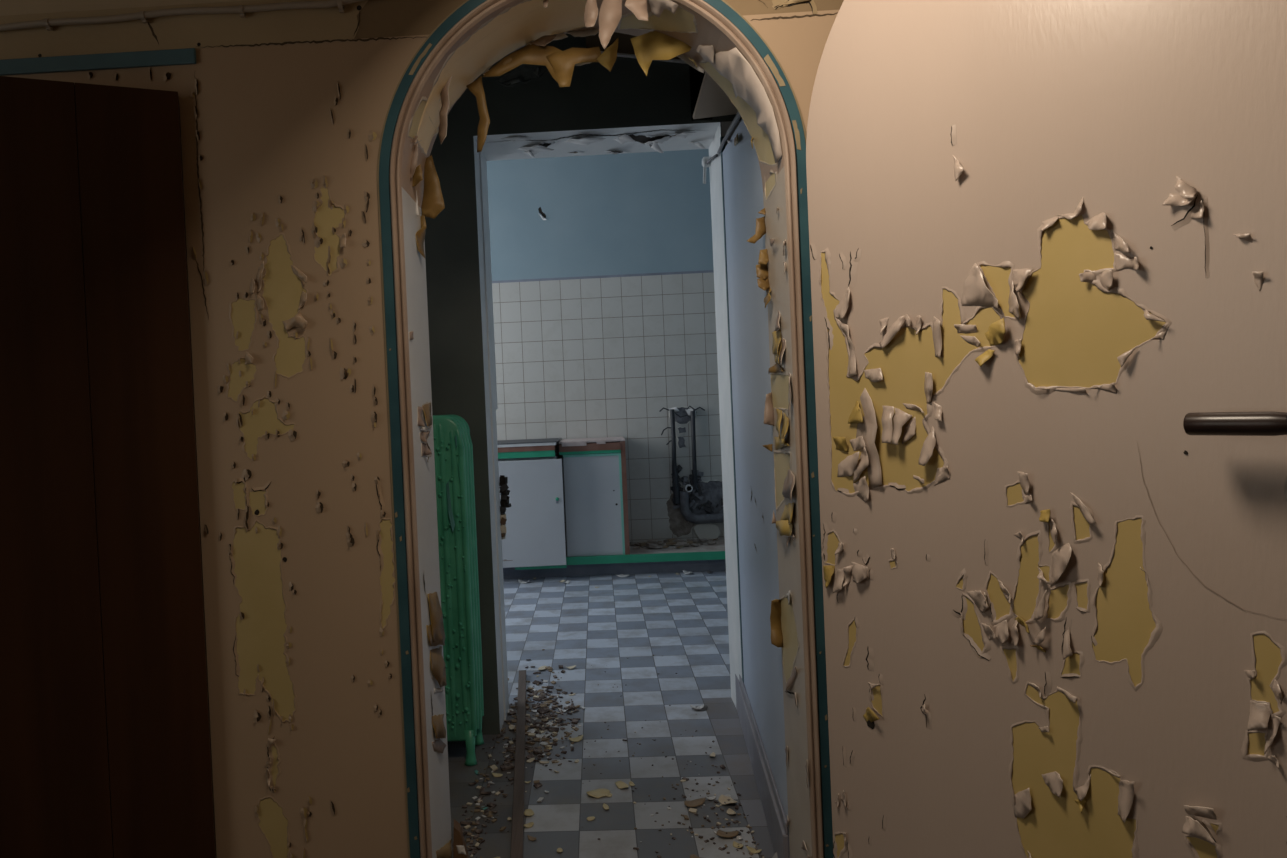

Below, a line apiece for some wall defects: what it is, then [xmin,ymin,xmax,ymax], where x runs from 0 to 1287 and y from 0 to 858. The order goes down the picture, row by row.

peeling [223,175,352,523]
peeling [407,0,801,547]
peeling [809,197,1172,502]
peeling [770,590,800,706]
peeling [813,512,898,603]
peeling [951,471,1163,858]
peeling [1182,805,1223,858]
peeling [1241,631,1287,768]